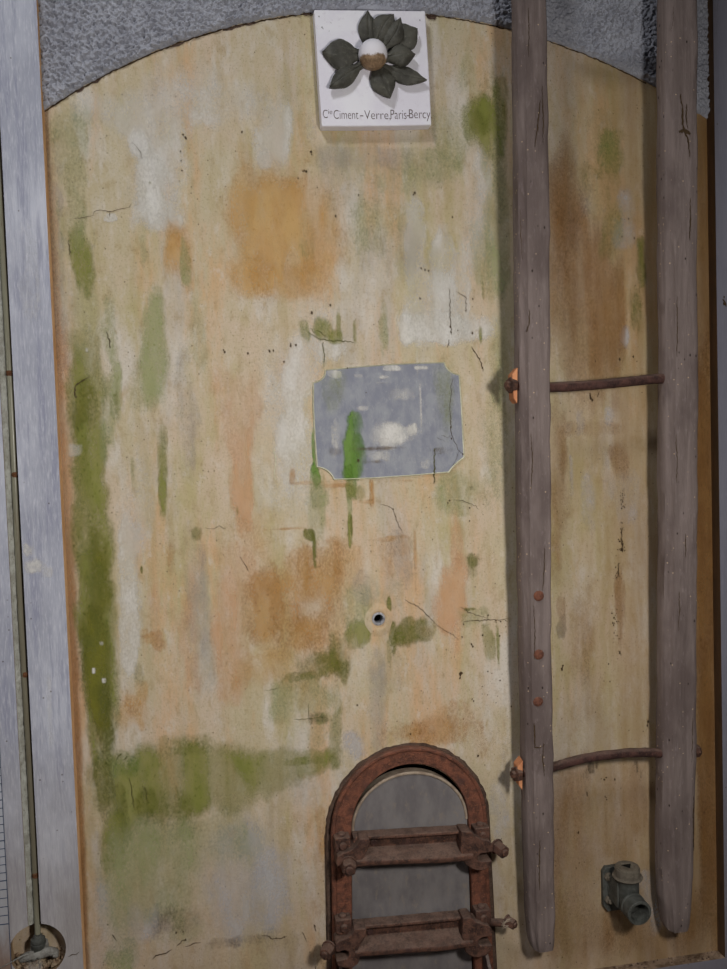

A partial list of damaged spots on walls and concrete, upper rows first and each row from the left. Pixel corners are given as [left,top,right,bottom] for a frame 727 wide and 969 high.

leakage [66,539,113,965]
crack [406,600,507,637]